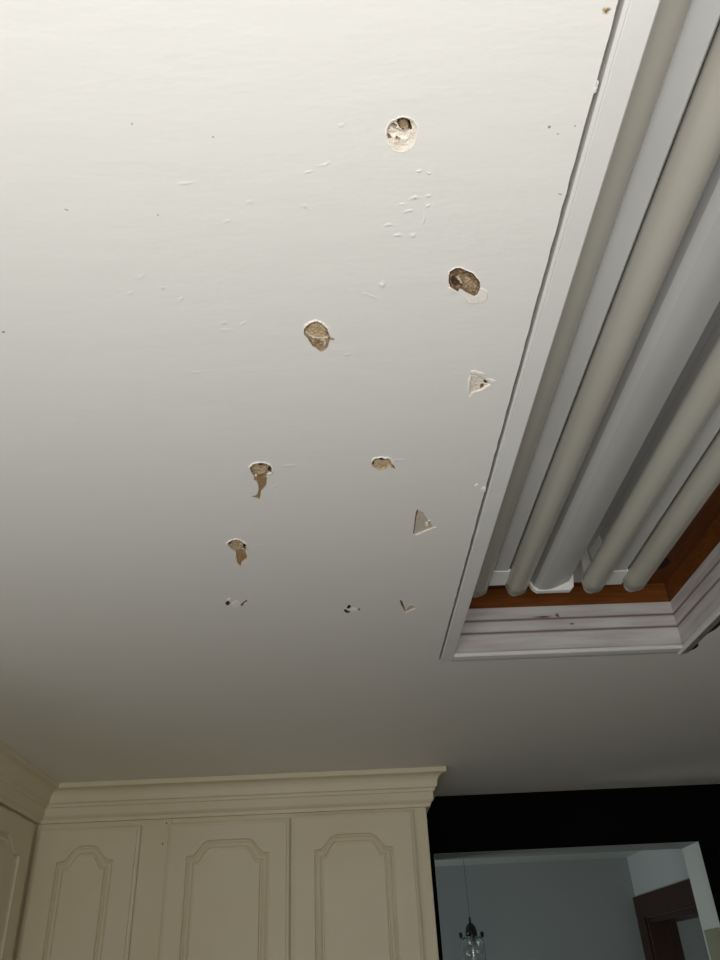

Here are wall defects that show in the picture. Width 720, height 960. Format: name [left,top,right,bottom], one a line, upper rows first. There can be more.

spalling [385,116,418,153]
spalling [448,266,488,304]
spalling [303,319,334,352]
spalling [468,370,495,397]
spalling [371,456,408,470]
spalling [248,461,298,499]
spalling [413,509,437,536]
spalling [226,538,267,566]